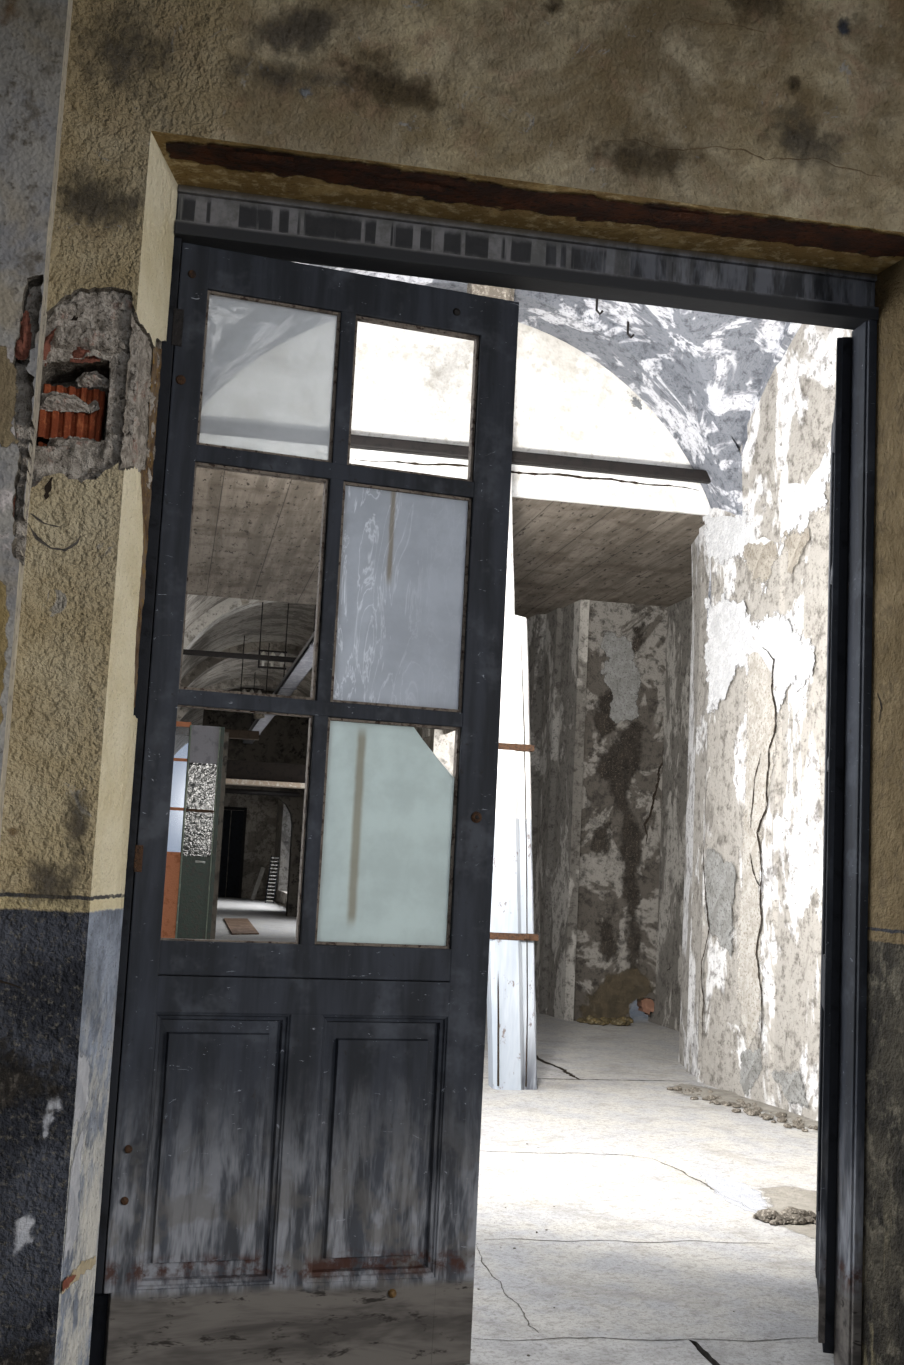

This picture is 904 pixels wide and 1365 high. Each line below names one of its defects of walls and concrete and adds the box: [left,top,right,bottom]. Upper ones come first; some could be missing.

damp [259,10,332,51]
damp [343,64,439,110]
rust [166,142,904,258]
damp [597,141,683,176]
spalling [0,285,162,724]
peeling [703,440,831,594]
flaking render [600,631,641,723]
peeling [704,593,815,1107]
crack [750,647,776,1046]
crack [667,840,709,1046]